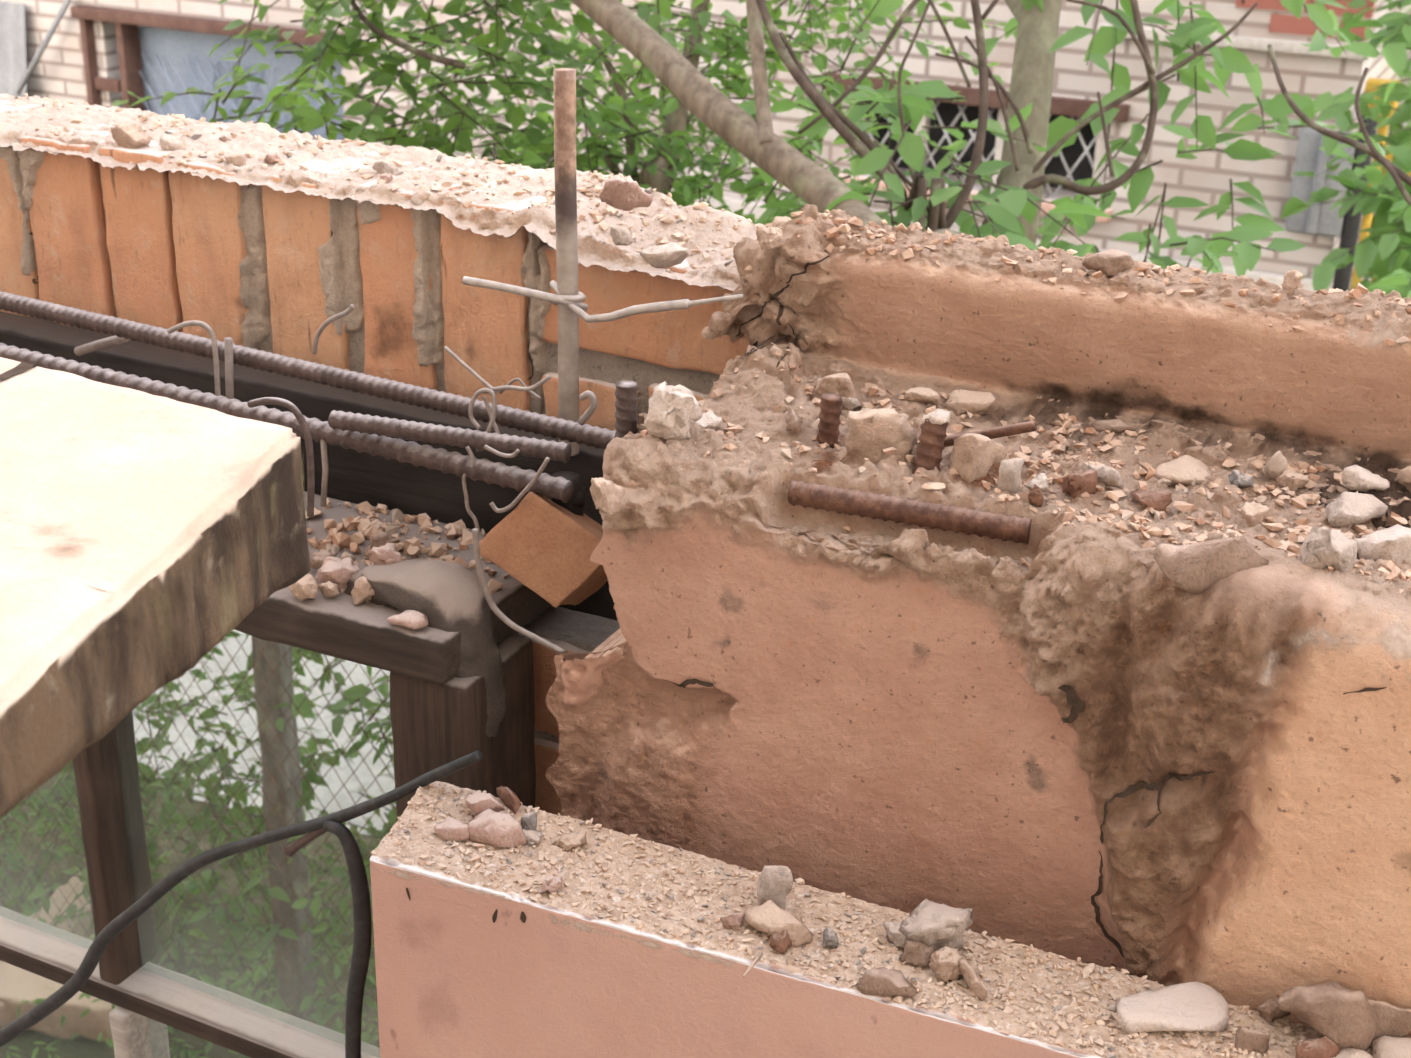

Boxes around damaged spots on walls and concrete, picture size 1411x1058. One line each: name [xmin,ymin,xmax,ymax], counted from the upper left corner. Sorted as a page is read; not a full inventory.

crack [736,255,830,367]
corrosion [815,451,834,473]
spalling [788,480,1032,545]
corrosion [954,463,1000,488]
flaking render [560,628,627,708]
crack [1091,771,1215,958]